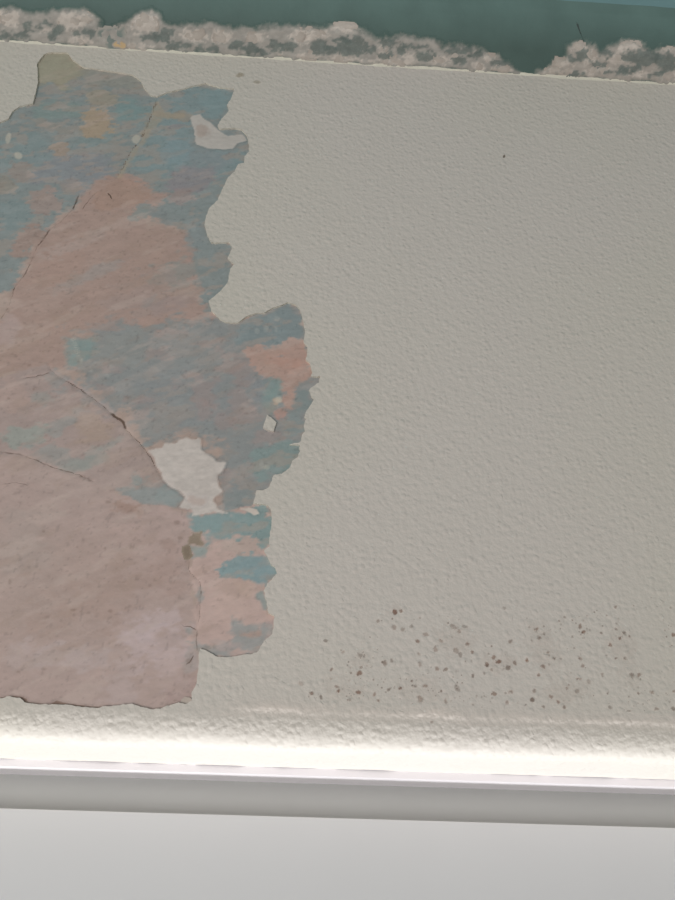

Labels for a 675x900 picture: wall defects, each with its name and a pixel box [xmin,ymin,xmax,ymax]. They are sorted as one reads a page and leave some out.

crack [68,382,153,462]
peeling [0,53,320,709]